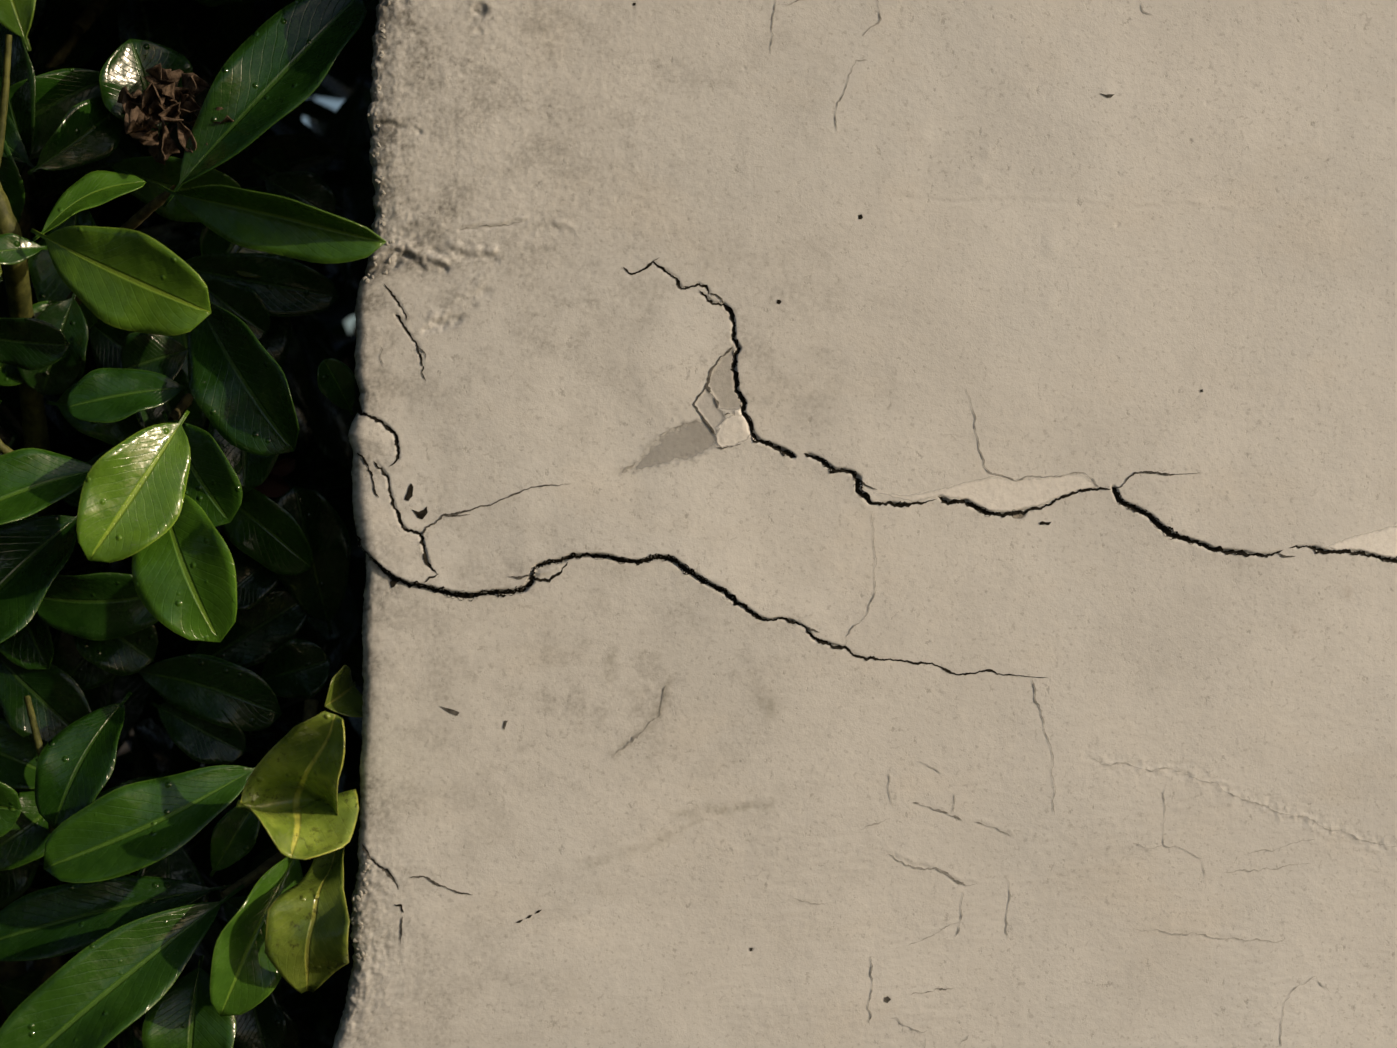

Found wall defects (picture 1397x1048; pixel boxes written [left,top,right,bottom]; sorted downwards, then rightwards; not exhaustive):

peeling [622,347,751,473]
crack [354,258,1397,815]
spalling [887,474,1096,525]
spalling [1329,527,1397,557]